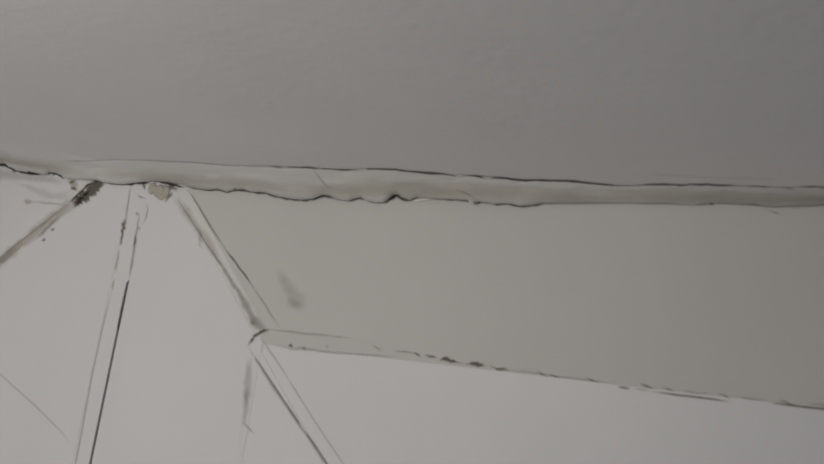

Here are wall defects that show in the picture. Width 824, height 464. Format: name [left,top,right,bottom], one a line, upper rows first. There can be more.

crack [277,167,447,175]
crack [108,179,148,187]
crack [471,175,614,186]
crack [646,181,731,189]
crack [193,188,414,203]
crack [445,199,550,207]